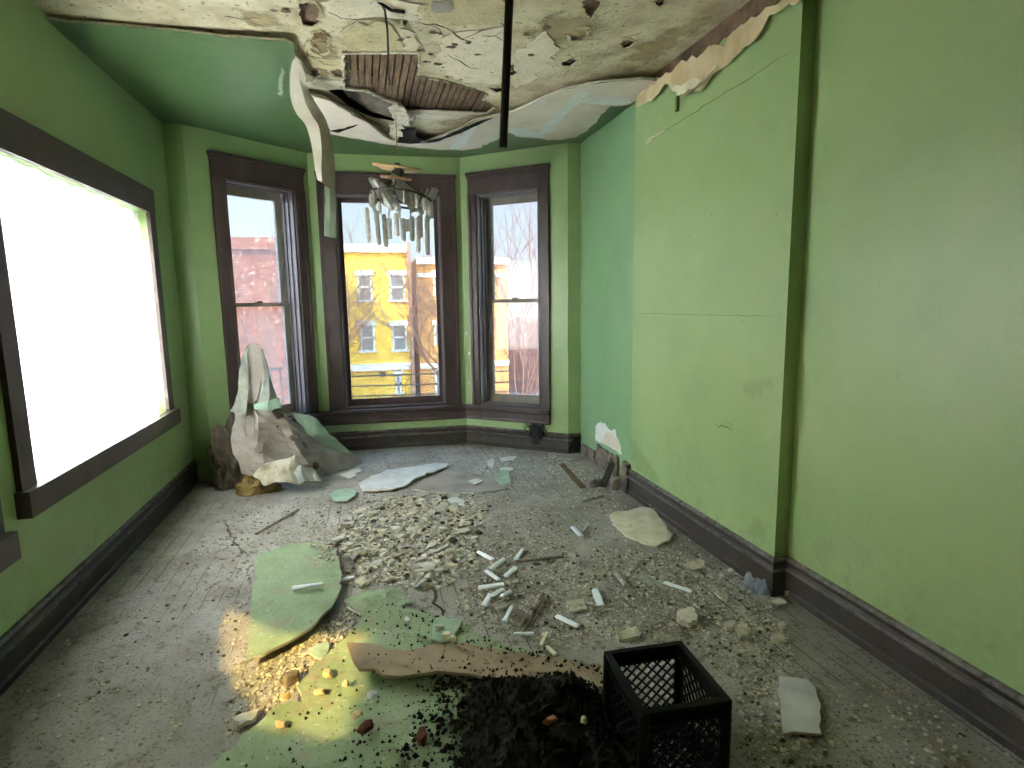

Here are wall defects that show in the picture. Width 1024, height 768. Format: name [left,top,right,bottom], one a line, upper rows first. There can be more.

peeling [270,0,656,150]
crack [644,53,789,144]
peeling [595,421,622,455]